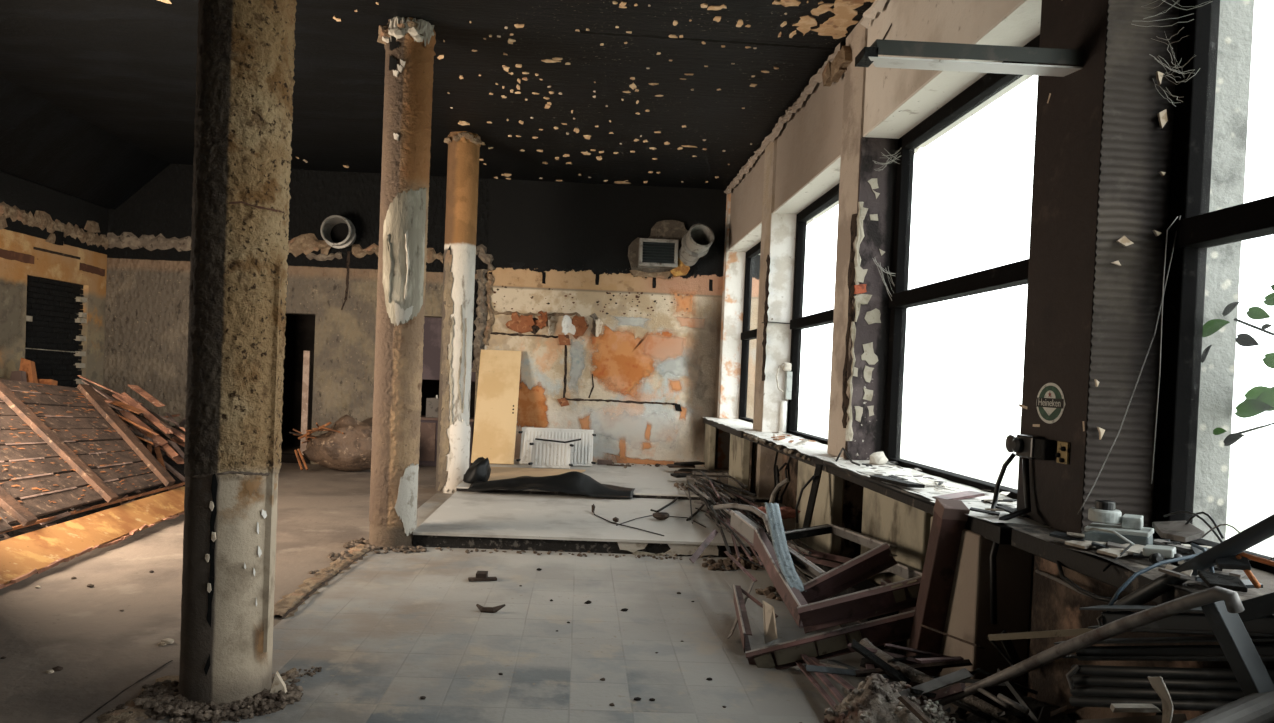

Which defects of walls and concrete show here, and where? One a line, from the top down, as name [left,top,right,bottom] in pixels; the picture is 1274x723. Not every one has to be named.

spalling [377,16,445,77]
spalling [444,92,493,165]
peeling [472,24,570,109]
peeling [507,68,707,184]
peeling [701,3,727,22]
flaking render [706,0,887,194]
peeling [288,187,690,492]
flaking render [842,178,881,441]
peeling [394,463,419,536]